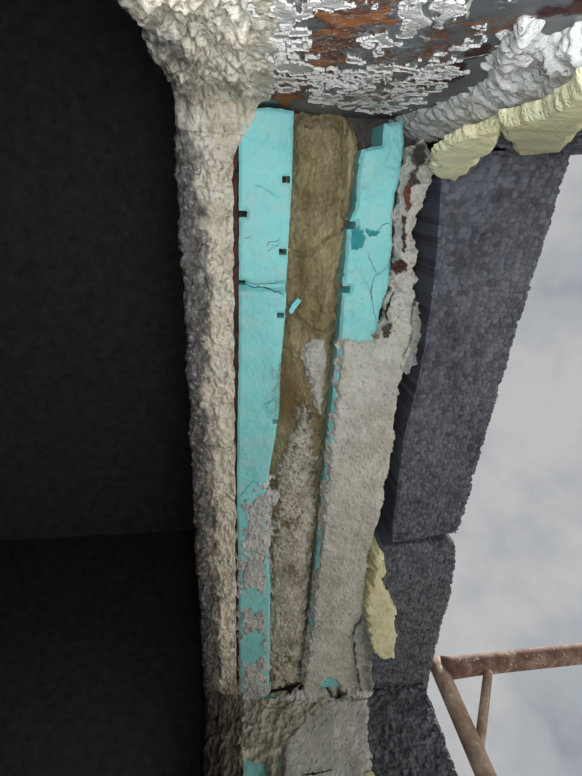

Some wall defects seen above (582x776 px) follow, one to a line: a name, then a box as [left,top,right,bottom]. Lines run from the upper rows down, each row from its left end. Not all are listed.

peeling [243,0,481,115]
rust [271,0,582,107]
crack [264,683,303,700]
crack [302,768,335,776]